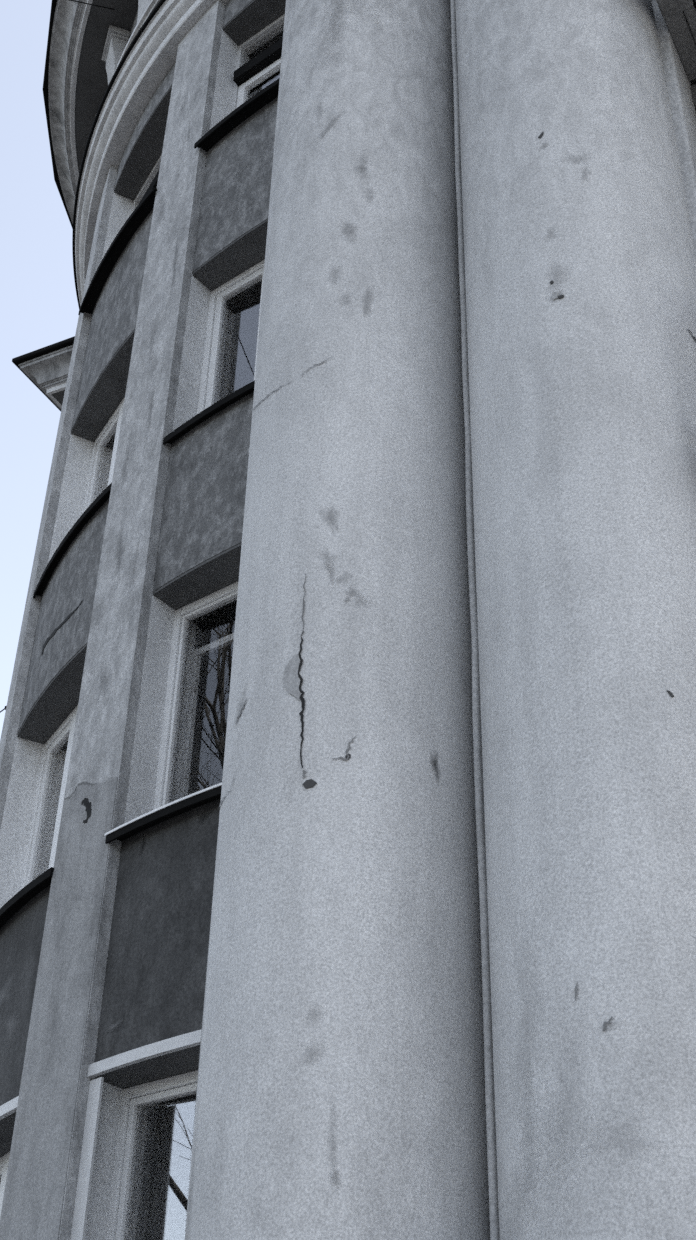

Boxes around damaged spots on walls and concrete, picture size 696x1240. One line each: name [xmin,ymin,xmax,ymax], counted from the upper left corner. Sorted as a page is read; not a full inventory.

crack [283,573,356,789]
spalling [81,798,92,824]